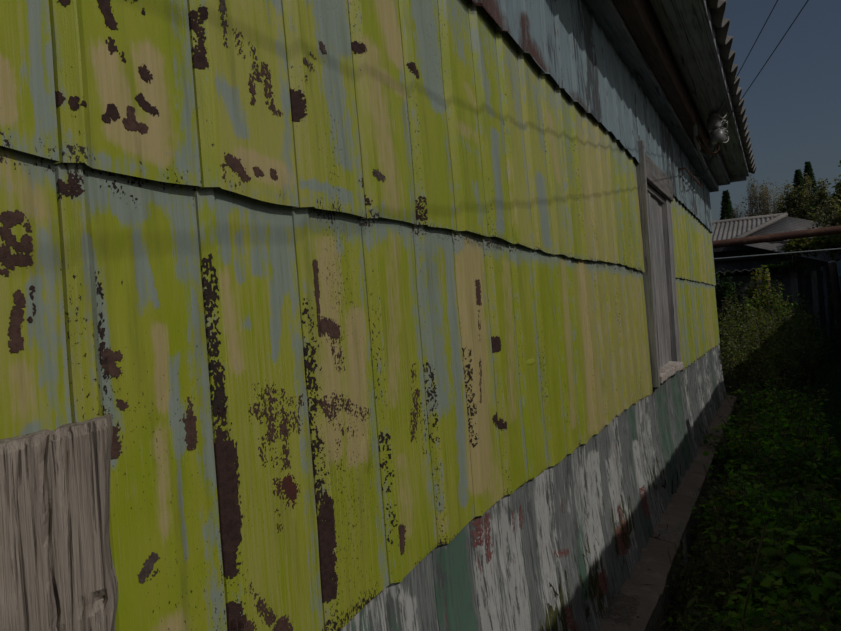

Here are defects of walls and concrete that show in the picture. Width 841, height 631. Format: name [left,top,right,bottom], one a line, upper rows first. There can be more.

corrosion [55,91,87,110]
corrosion [97,0,126,63]
corrosion [102,92,160,134]
corrosion [188,4,209,69]
corrosion [218,0,281,117]
corrosion [289,40,327,121]
corrosion [222,152,278,183]
corrosion [0,209,34,276]
corrosion [8,285,36,353]
corrosion [95,271,123,415]
corrosion [200,254,293,631]
corrosion [249,259,371,603]